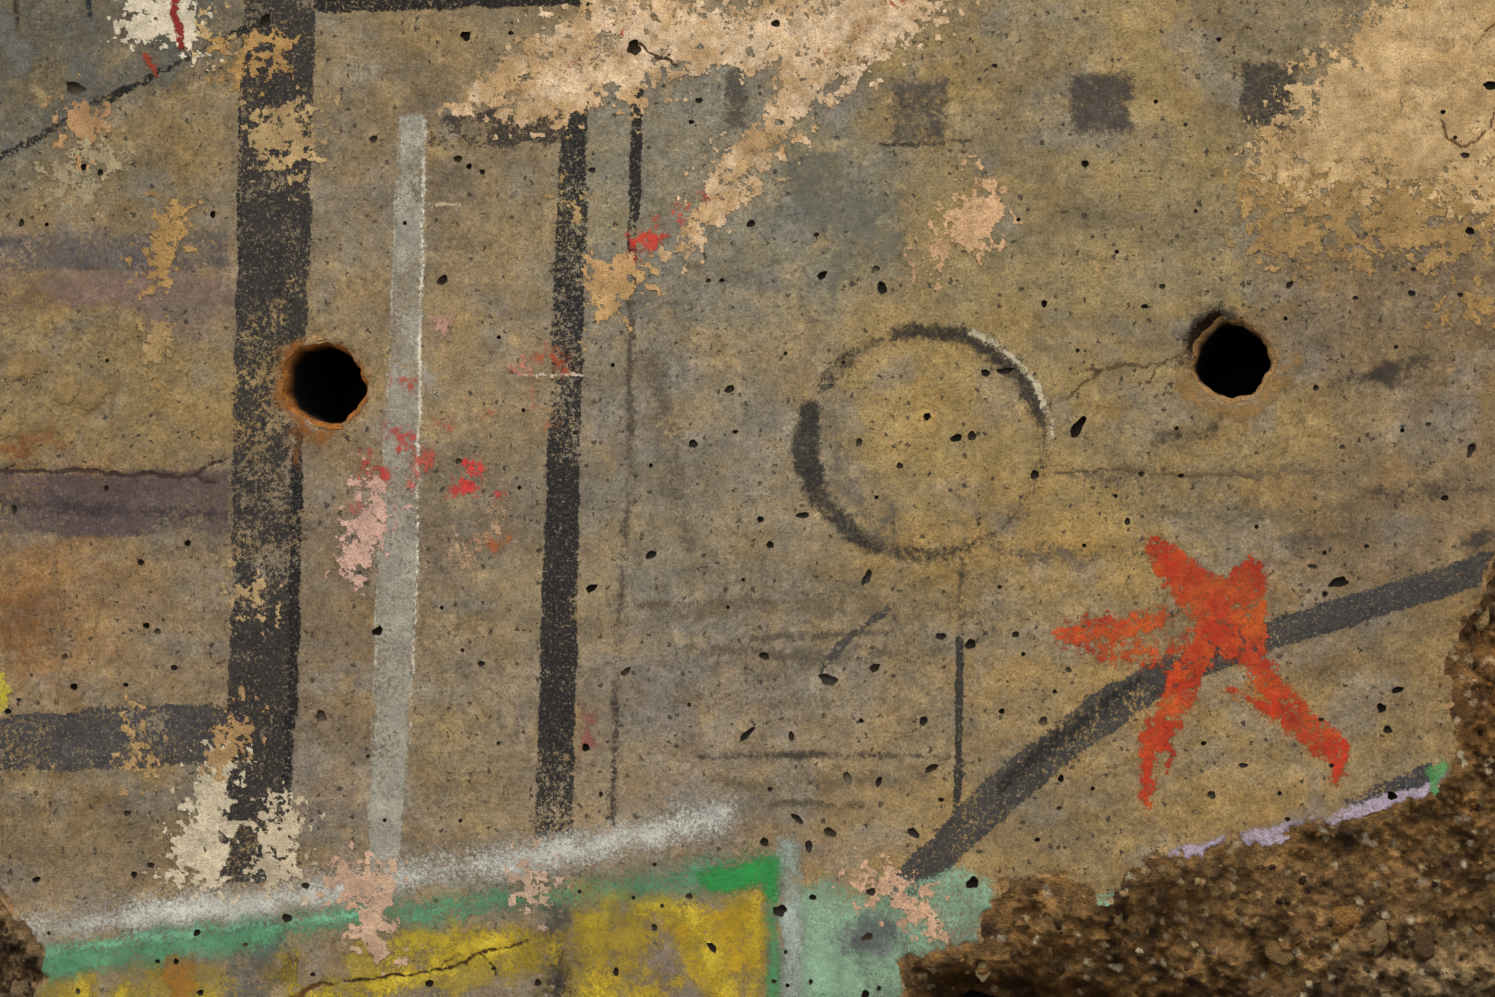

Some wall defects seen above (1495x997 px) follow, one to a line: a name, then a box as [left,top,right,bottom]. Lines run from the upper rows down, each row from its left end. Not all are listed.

peeling [437,0,980,351]
peeling [1222,0,1495,336]
peeling [871,155,1024,295]
spalling [1186,311,1243,359]
spalling [981,368,1015,377]
spalling [950,431,976,442]
spalling [1070,416,1087,438]
spalling [818,674,839,686]
spalling [832,559,1495,997]
spalling [791,814,837,853]
spalling [0,893,51,997]
crack [290,939,529,997]